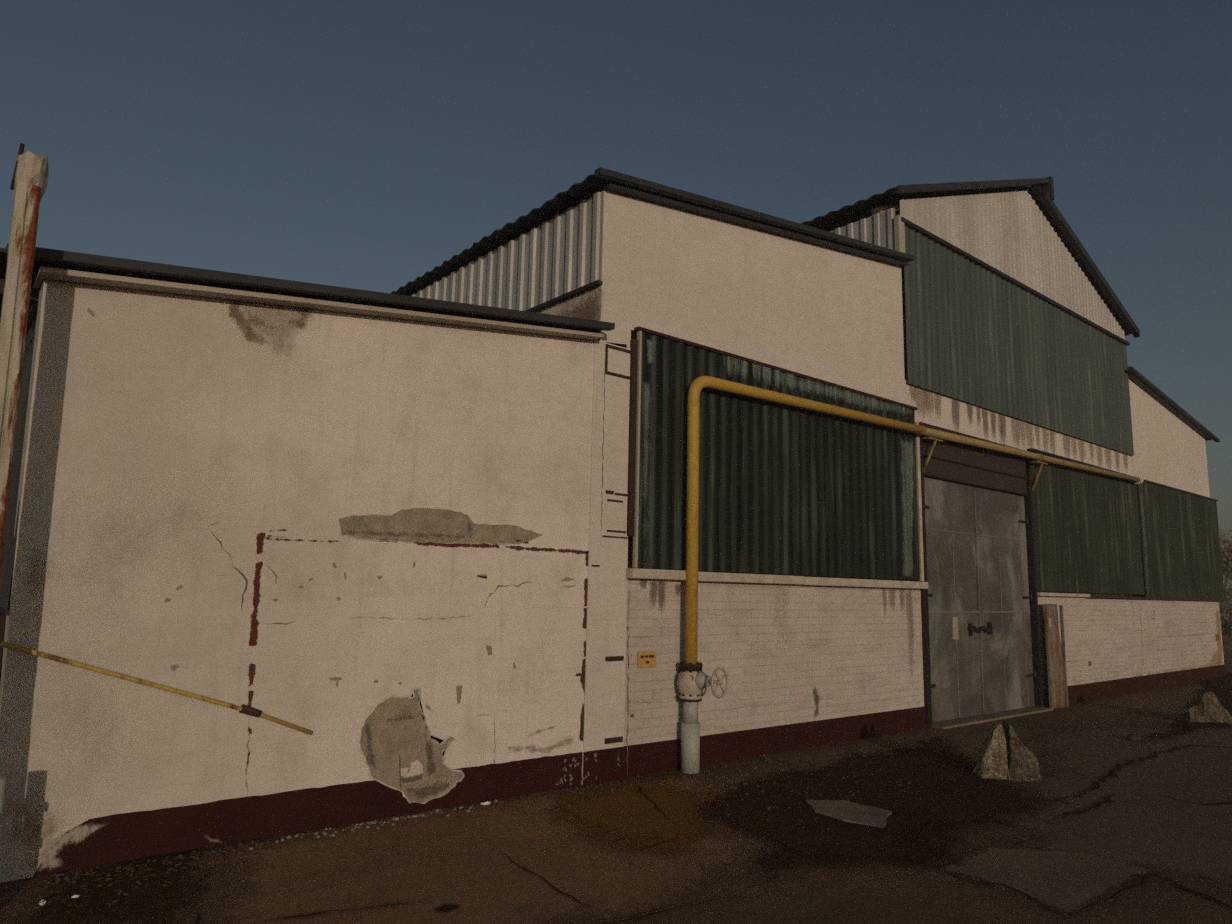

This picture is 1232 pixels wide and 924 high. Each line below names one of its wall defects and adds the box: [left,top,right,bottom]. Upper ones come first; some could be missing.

crack [209,522,292,624]
flaking render [337,507,543,545]
flaking render [357,682,465,804]